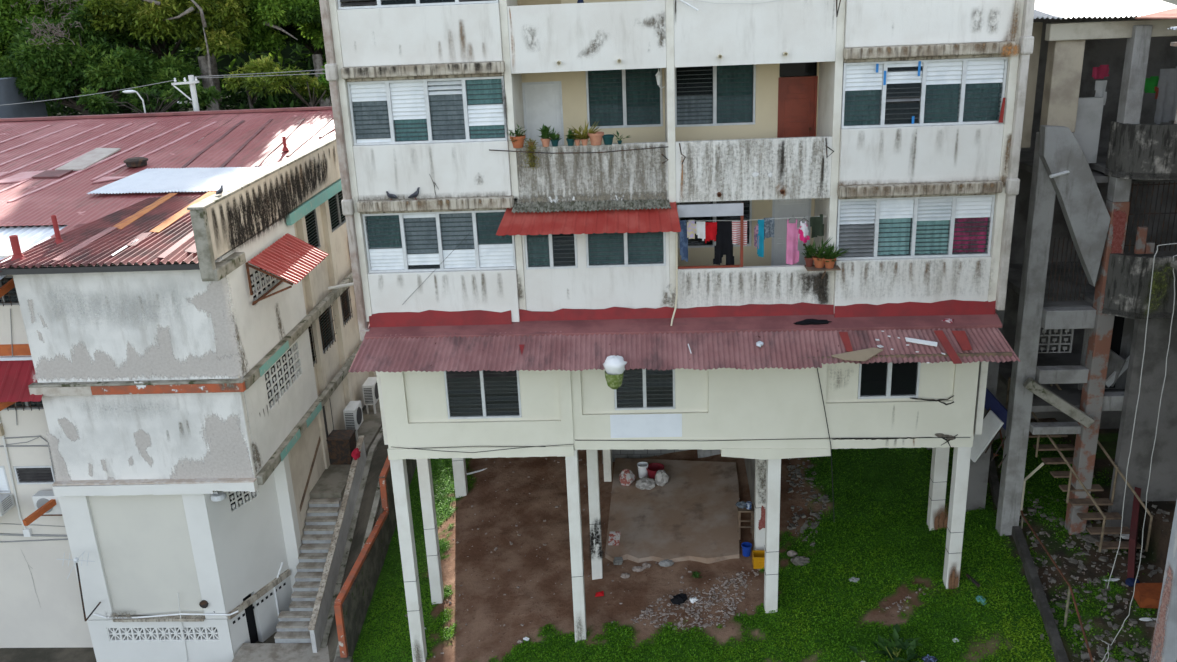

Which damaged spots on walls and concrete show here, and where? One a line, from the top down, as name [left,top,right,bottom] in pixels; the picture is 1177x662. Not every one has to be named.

leakage [644,0,676,45]
leakage [212,147,335,251]
leakage [360,179,504,207]
leakage [516,145,667,200]
leakage [682,135,1012,201]
leakage [755,273,828,304]
peeling [33,276,242,392]
peeling [47,417,79,481]
peeling [128,430,153,466]
peeling [171,414,257,493]